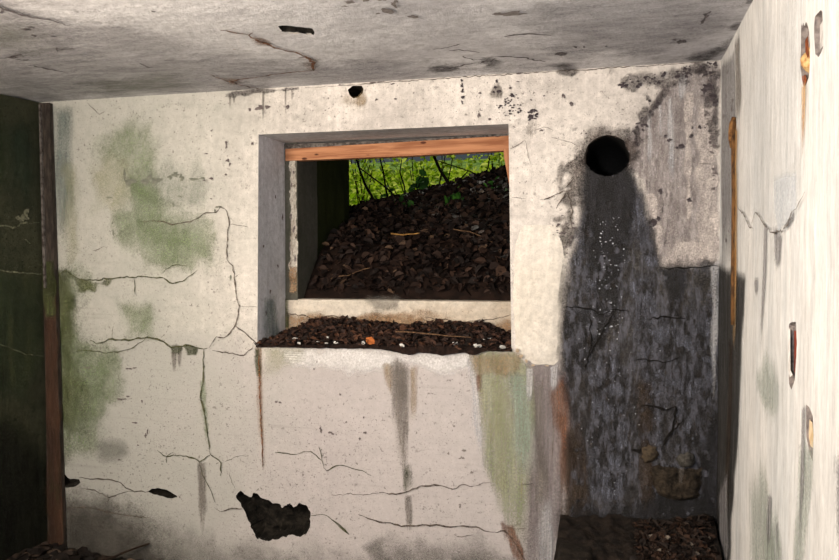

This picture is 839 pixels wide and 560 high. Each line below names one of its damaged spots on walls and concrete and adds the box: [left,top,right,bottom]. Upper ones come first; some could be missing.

crack [0,7,68,26]
spalling [278,25,314,35]
crack [5,48,74,72]
water stain [623,69,689,146]
water stain [689,24,741,249]
crack [739,194,804,234]
water stain [354,305,431,324]
crack [66,207,525,560]
water stain [470,165,781,560]
water stain [386,360,415,523]
spalling [806,405,814,462]
spalling [236,491,311,541]